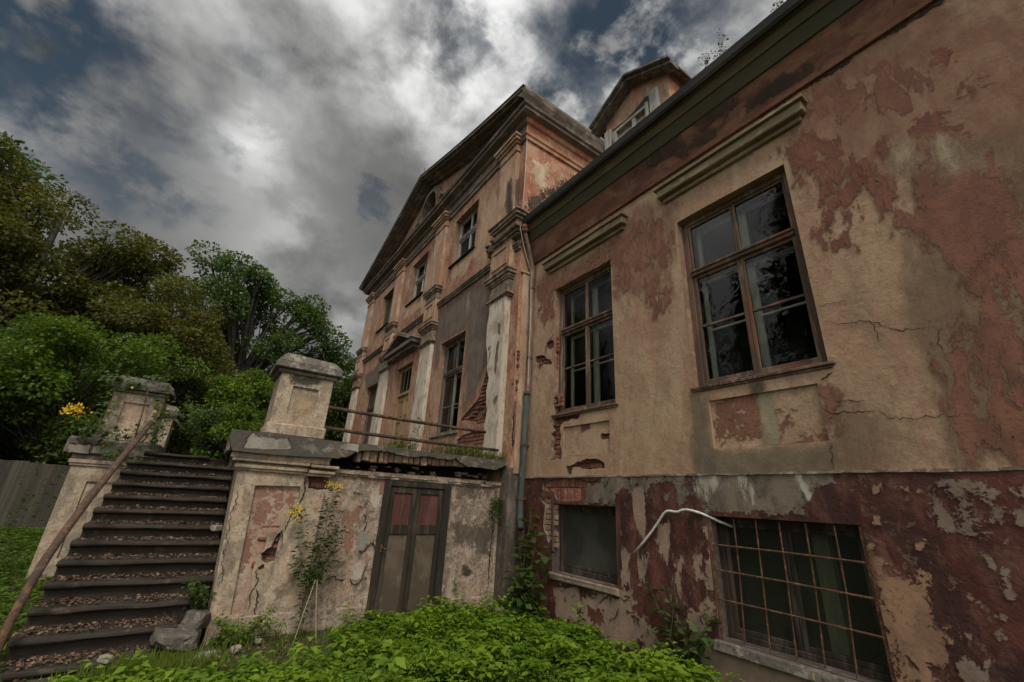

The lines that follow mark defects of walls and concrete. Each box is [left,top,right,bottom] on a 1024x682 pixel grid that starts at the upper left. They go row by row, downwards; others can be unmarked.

peeling [769,47,994,259]
peeling [536,218,675,326]
crack [817,300,943,350]
spalling [458,323,500,445]
crack [823,400,959,420]
crack [218,492,239,587]
crack [249,572,259,614]
crack [284,476,306,531]
spalling [238,443,487,581]
peeling [541,393,836,682]
peeling [866,538,996,682]
peeling [980,551,1017,601]